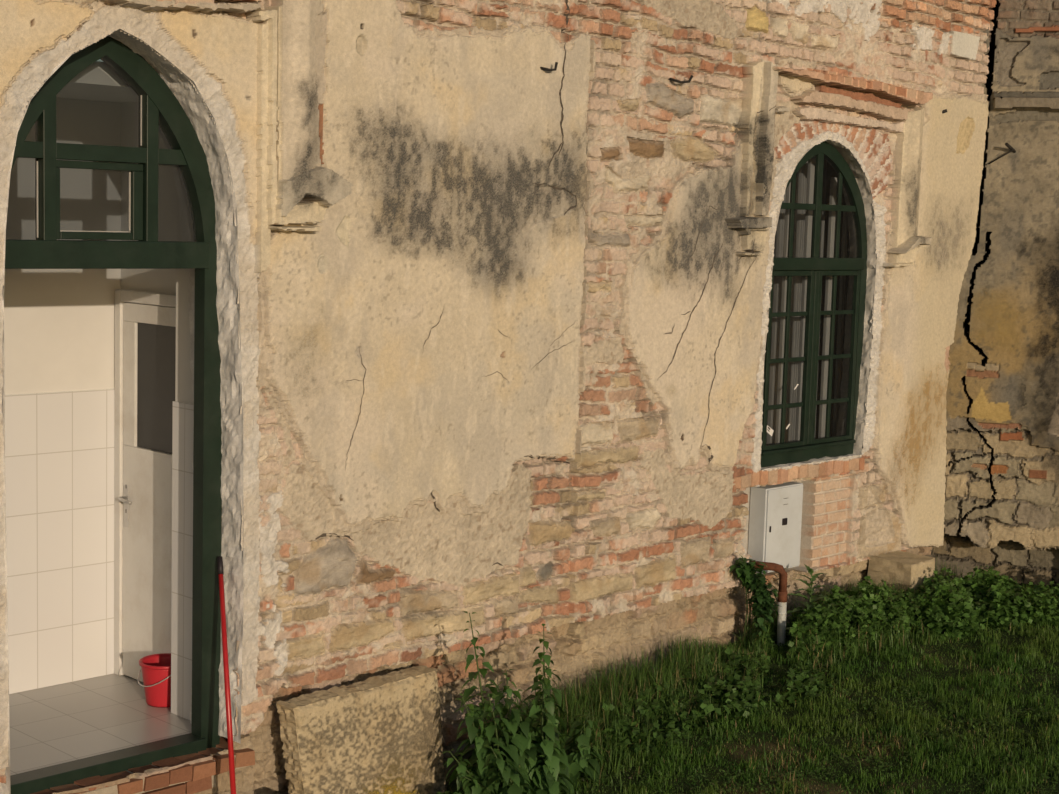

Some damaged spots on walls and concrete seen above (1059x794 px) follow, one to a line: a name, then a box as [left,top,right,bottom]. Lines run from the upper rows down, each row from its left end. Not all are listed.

spalling [6,0,129,91]
spalling [165,0,283,182]
water stain [126,0,353,272]
water stain [359,113,587,286]
crack [535,0,577,215]
spalling [233,0,1059,736]
crack [658,206,757,462]
crack [945,0,1001,535]
water stain [1021,233,1059,431]